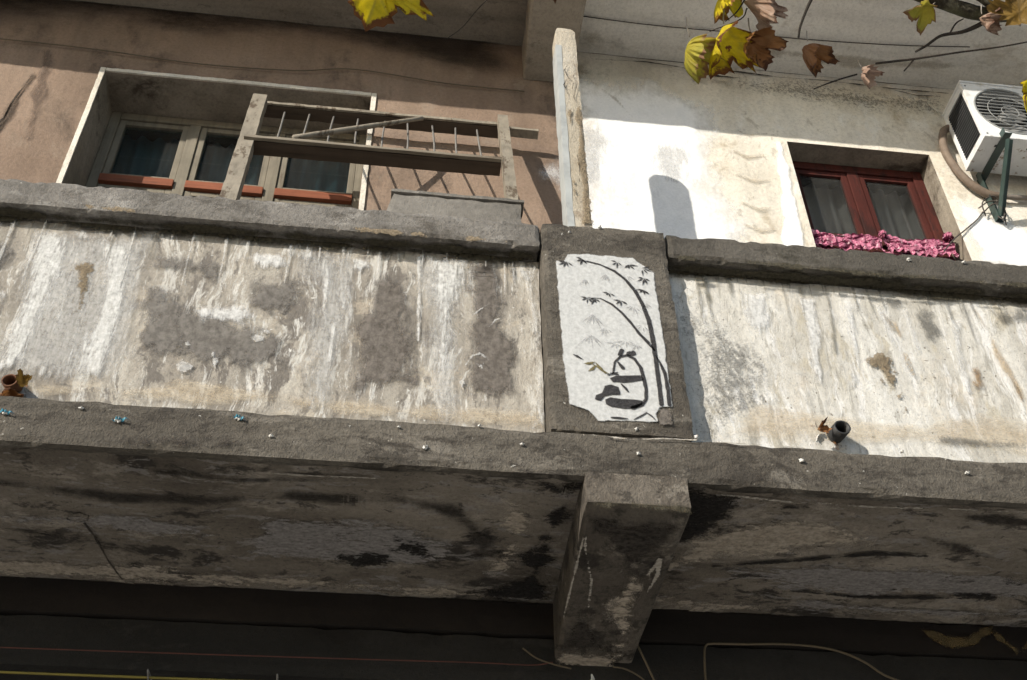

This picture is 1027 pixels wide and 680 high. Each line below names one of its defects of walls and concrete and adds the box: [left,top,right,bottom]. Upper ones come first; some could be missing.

crack [0,78,30,126]
damp [254,250,311,267]
damp [140,280,300,367]
damp [354,275,420,390]
damp [417,257,514,395]
damp [53,488,241,506]
damp [233,473,378,505]
crack [67,512,122,579]
damp [0,561,329,588]
damp [334,535,433,567]
damp [420,482,582,601]
damp [557,487,866,667]